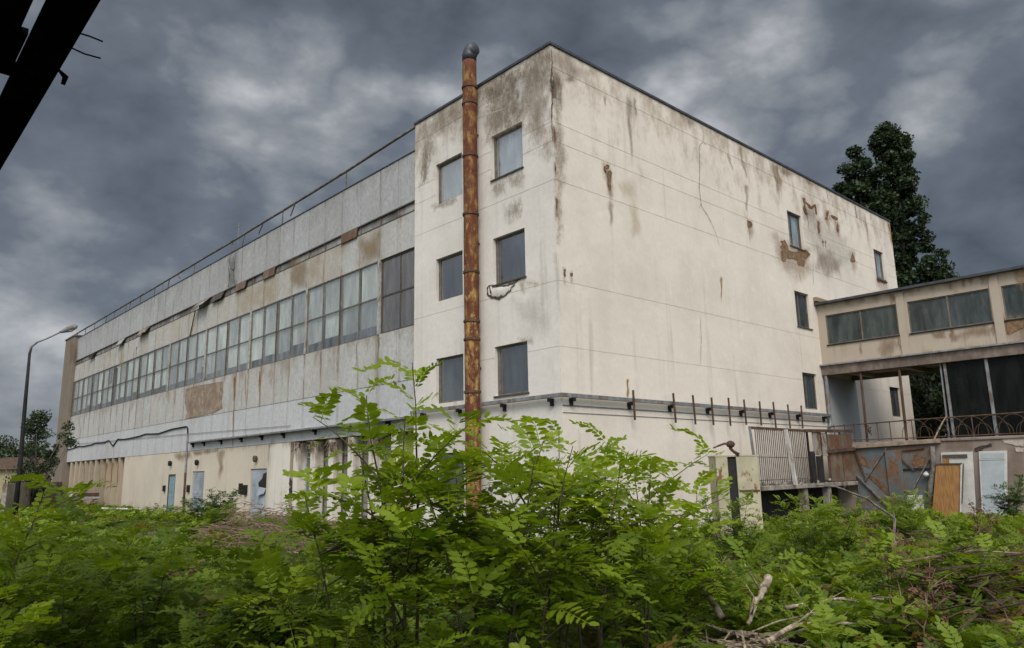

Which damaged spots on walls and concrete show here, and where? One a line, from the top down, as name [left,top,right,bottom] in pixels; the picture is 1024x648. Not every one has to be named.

peeling [803,198,839,244]
spalling [780,240,810,266]